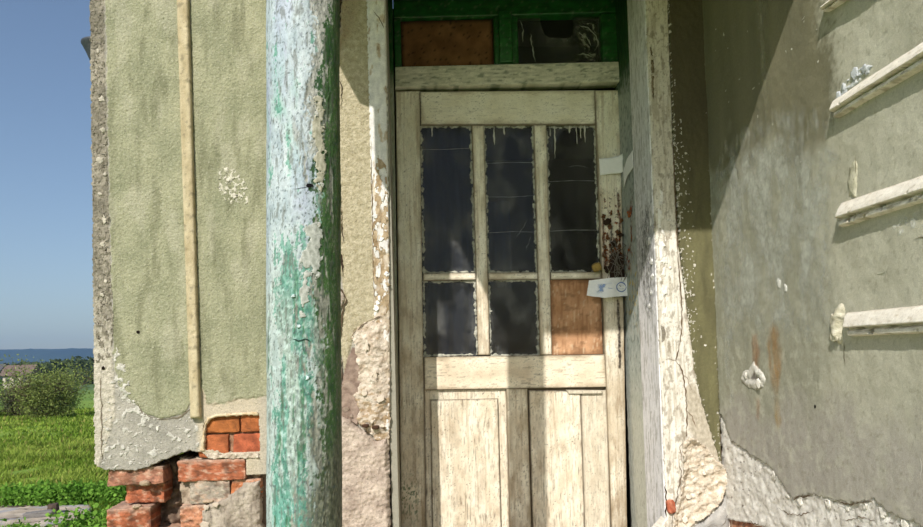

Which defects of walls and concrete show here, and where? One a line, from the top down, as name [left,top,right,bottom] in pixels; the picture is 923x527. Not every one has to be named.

peeling [312,95,327,194]
spalling [90,0,265,527]
peeling [291,222,323,328]
crack [338,209,346,272]
peeling [370,145,391,315]
corrosion [601,194,633,274]
spalling [341,347,361,425]
spalling [741,361,766,390]
spalling [660,415,920,527]